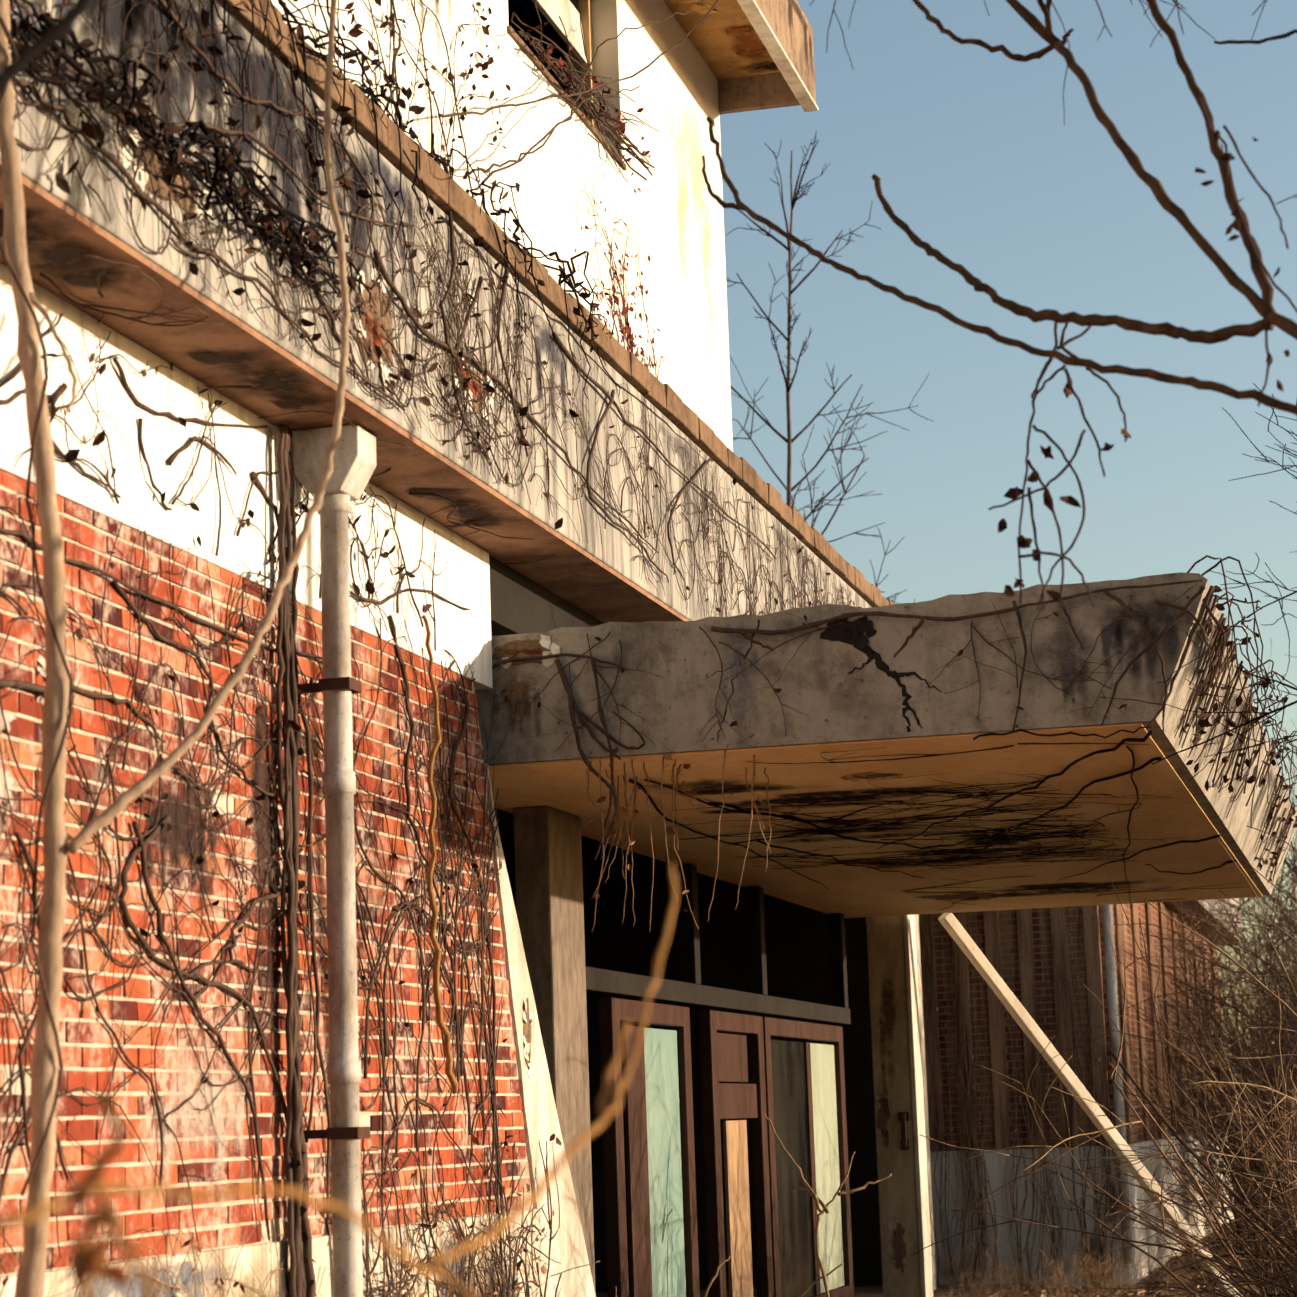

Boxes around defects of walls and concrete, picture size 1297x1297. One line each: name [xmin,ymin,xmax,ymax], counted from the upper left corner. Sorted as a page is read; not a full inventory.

water stain [190,352,324,409]
water stain [408,489,499,526]
spalling [492,634,560,669]
crack [847,645,941,732]
water stain [652,781,957,842]
water stain [996,881,1131,897]